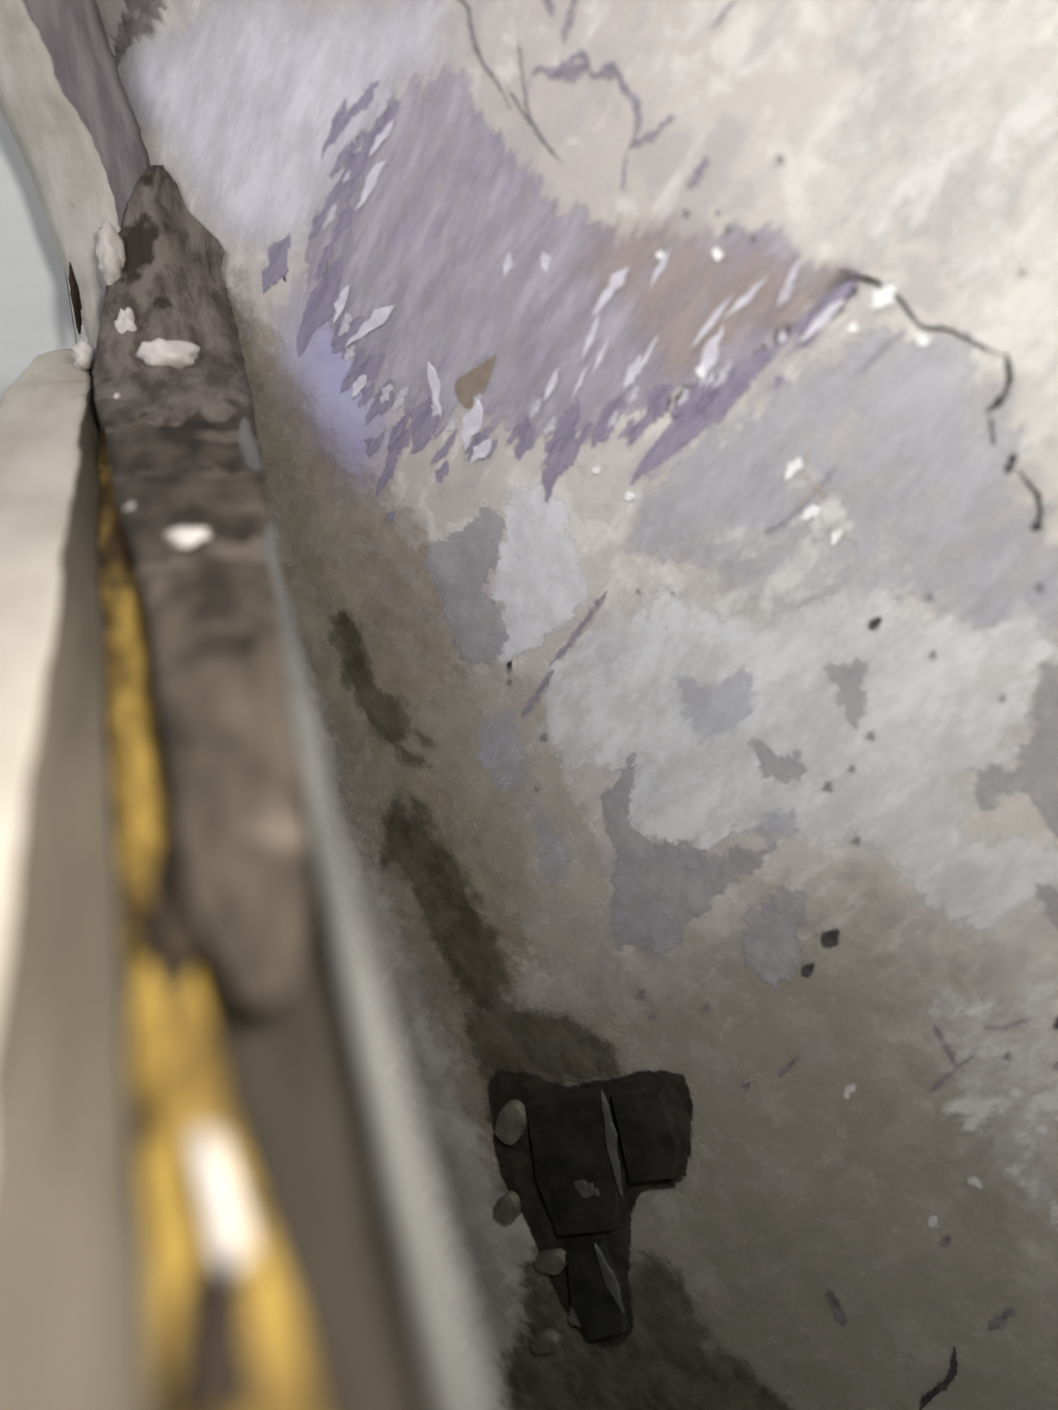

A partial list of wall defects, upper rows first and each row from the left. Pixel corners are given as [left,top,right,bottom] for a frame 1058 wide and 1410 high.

crack [459,0,674,190]
peeling [261,64,859,502]
peeling [871,285,896,310]
crack [826,275,1043,532]
peeling [423,502,509,666]
peeling [747,739,806,784]
peeling [755,457,856,545]
peeling [825,659,875,741]
spalling [868,617,882,630]
peeling [968,662,1058,837]
damp [229,299,1058,1410]
peeling [601,753,778,956]